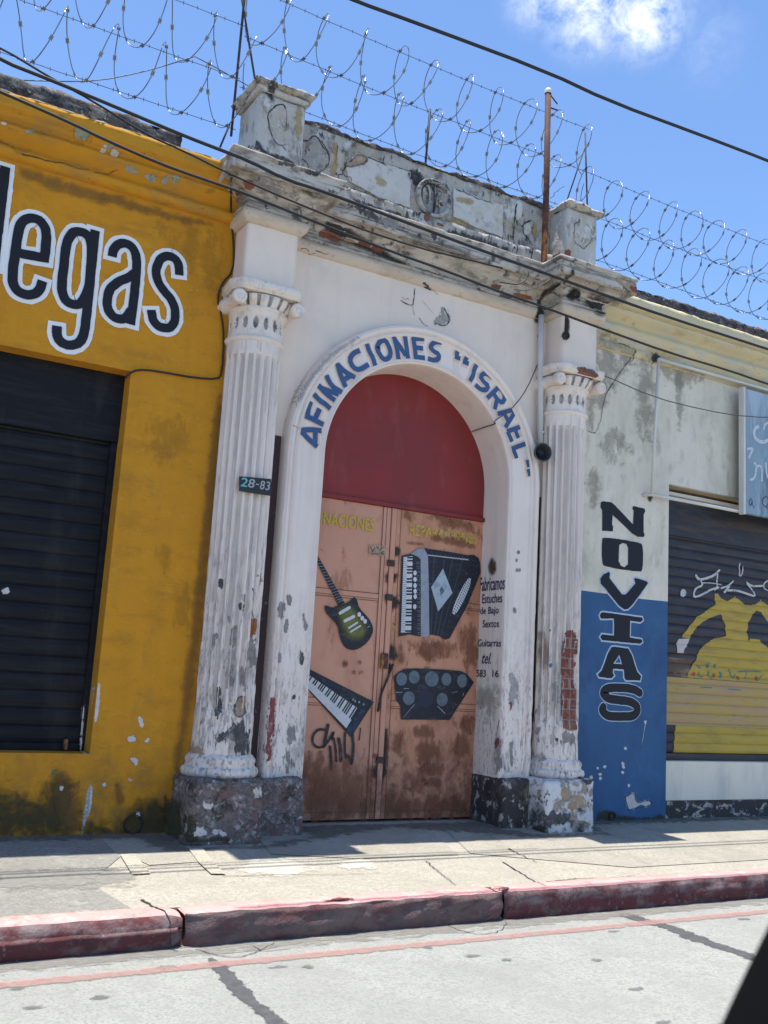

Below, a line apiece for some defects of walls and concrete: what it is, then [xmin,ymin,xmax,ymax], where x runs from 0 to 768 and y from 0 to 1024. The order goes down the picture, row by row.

flaking render [319,229,385,254]
spalling [523,220,537,244]
peeling [80,683,101,754]
peeling [212,594,296,774]
flaking render [549,630,578,745]
peeling [81,782,106,835]
leakage [0,780,227,842]
corrosion [302,716,476,823]
peeling [529,765,606,828]
peeling [621,746,653,811]